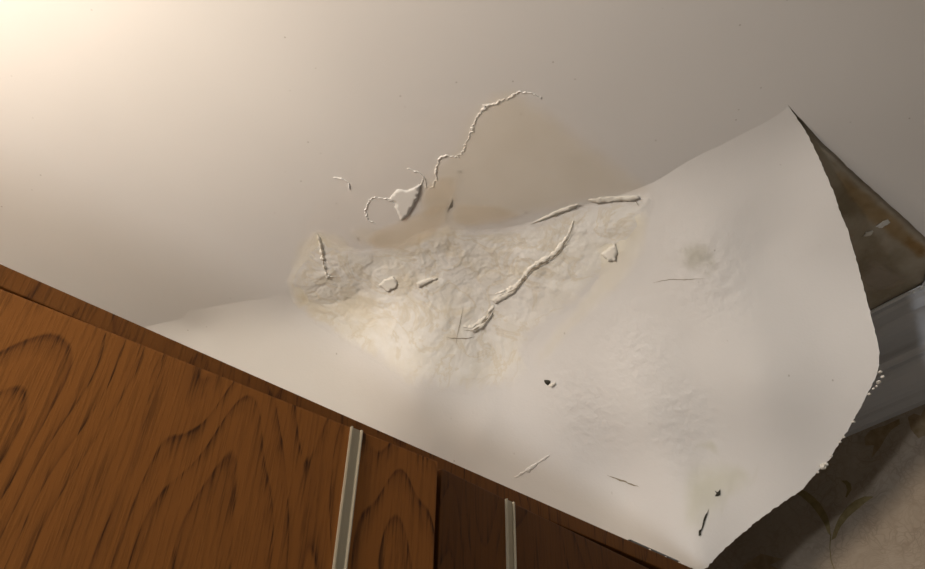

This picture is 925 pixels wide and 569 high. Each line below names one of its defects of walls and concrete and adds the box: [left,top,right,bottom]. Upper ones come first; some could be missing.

peeling [364,91,541,224]
flaking render [286,193,655,397]
peeling [788,105,925,310]